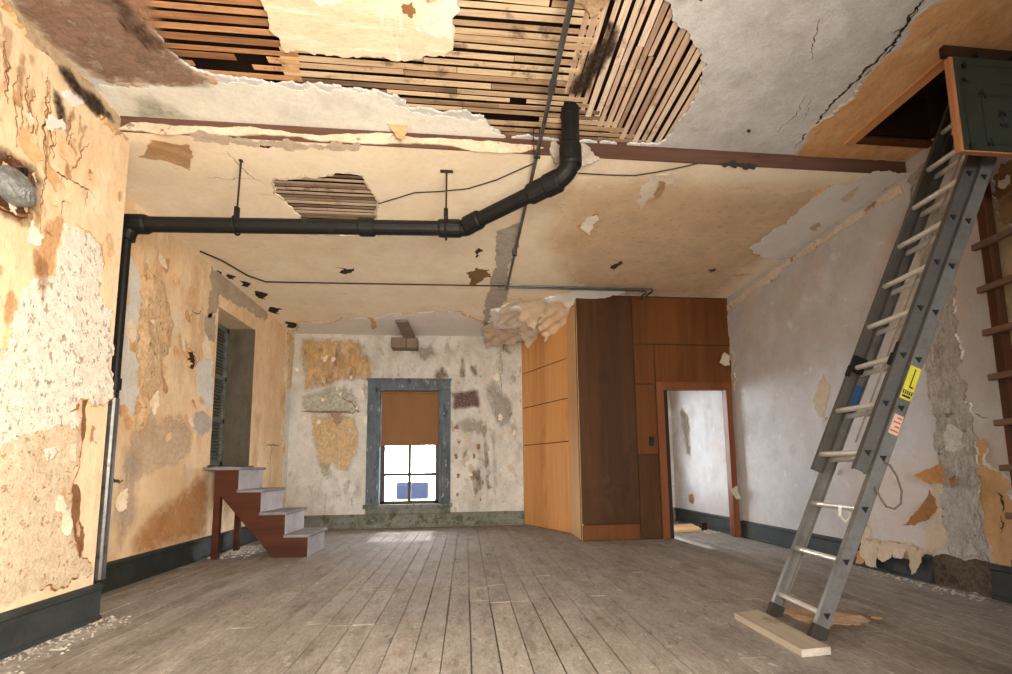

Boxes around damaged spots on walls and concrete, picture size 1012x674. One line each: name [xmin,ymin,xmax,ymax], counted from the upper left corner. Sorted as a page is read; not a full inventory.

peeling [9,203,44,246]
damp [0,41,74,270]
flaking render [62,90,84,108]
damp [9,0,222,118]
flaking render [98,80,503,138]
flaking render [401,0,460,39]
flaking render [749,162,925,260]
crack [779,0,924,149]
flaking render [0,223,214,605]
flaking render [280,290,625,508]
spalling [924,284,989,563]
peeling [856,543,921,574]